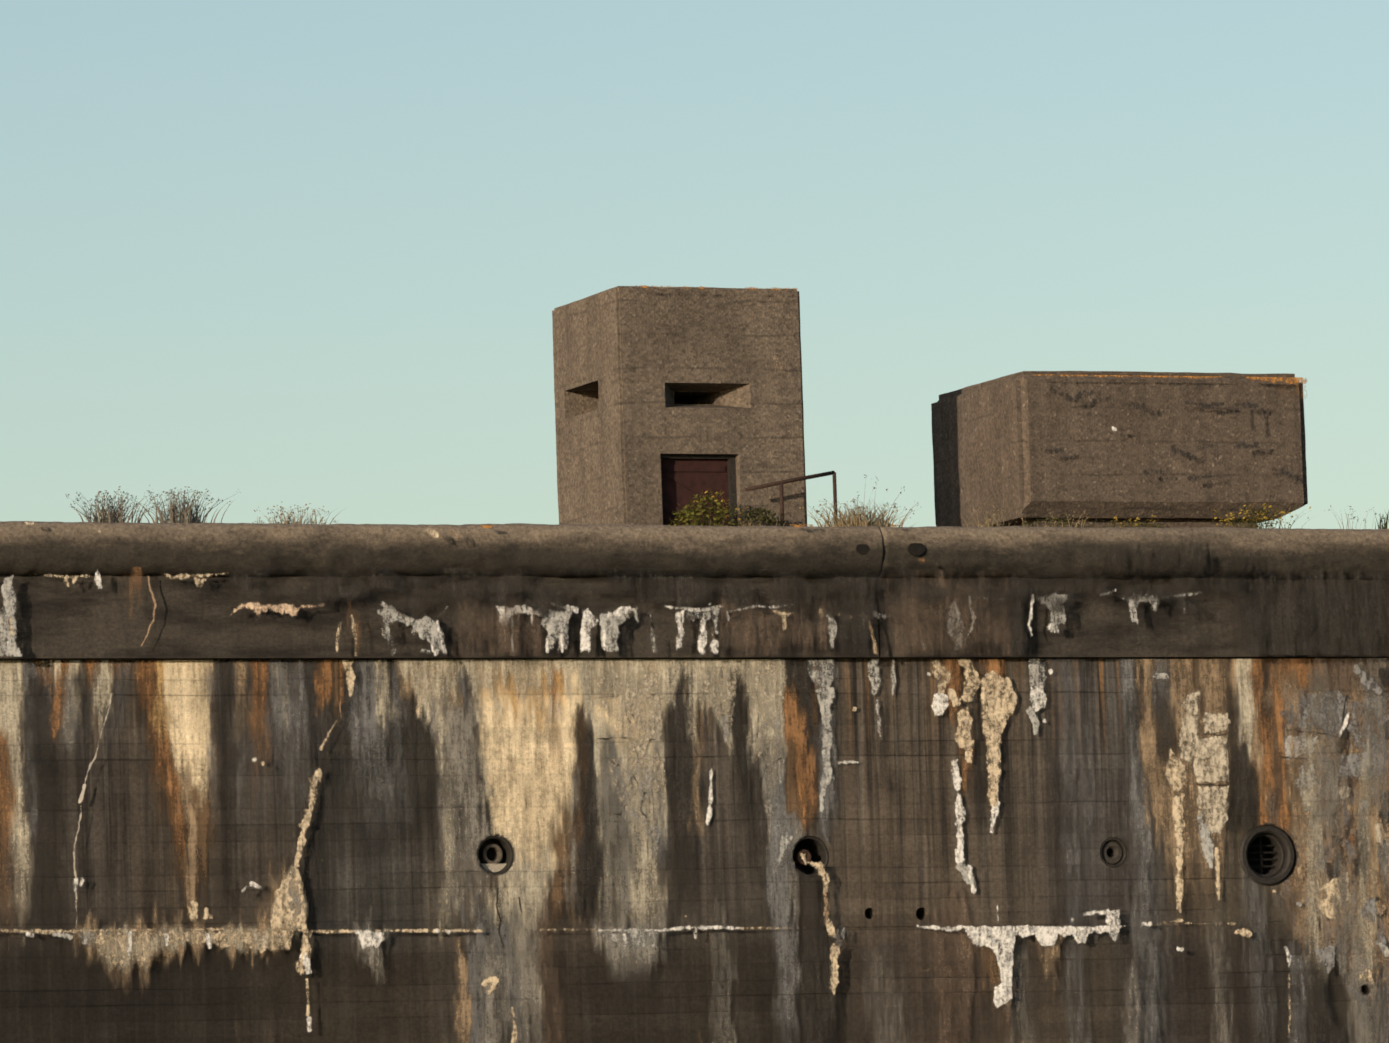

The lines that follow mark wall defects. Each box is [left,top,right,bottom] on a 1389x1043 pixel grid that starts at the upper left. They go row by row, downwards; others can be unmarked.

peeling [377,601,447,656]
peeling [1038,592,1068,633]
corrosion [0,660,218,957]
leakage [0,567,1244,1043]
corrosion [783,659,823,828]
peeling [1136,658,1231,913]
peeling [1071,909,1122,940]